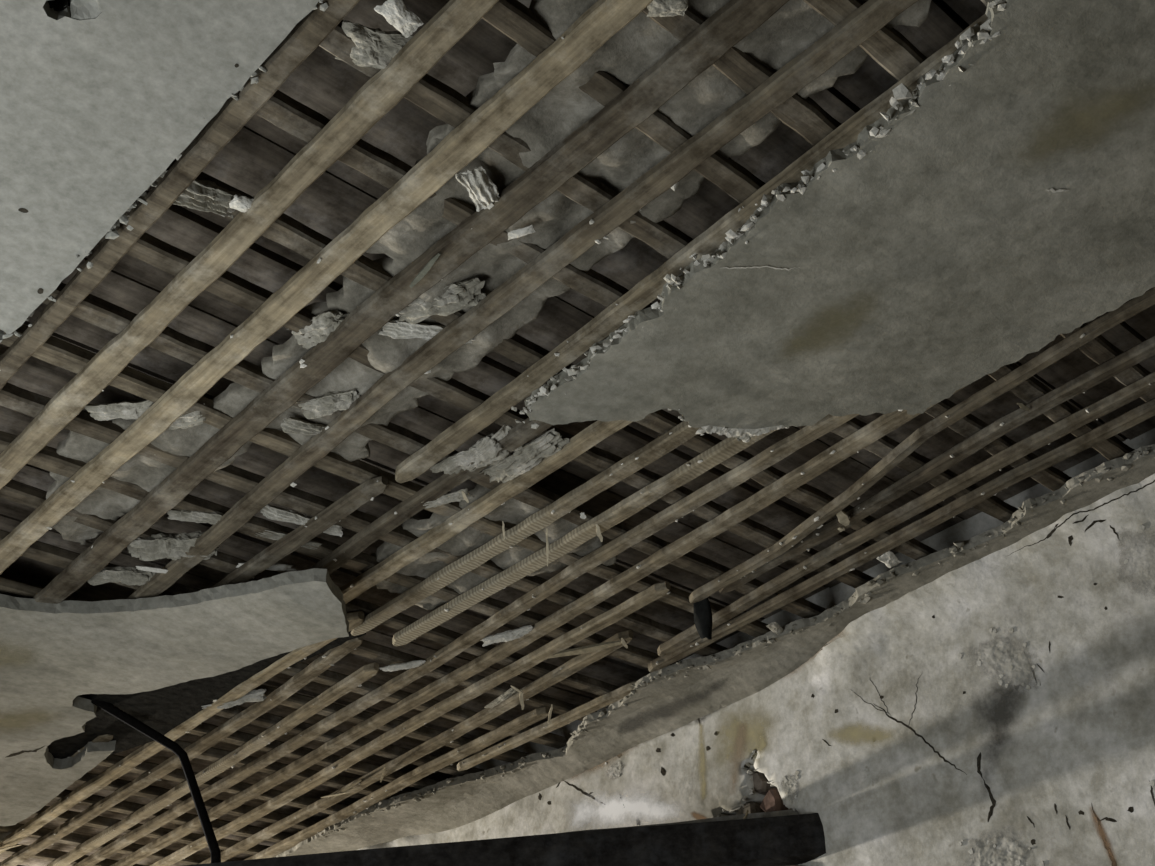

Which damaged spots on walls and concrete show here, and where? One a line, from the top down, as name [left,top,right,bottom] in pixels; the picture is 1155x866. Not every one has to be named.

spalling [47,0,102,20]
spalling [843,0,1007,160]
spalling [105,182,158,239]
spalling [651,163,836,312]
spalling [511,315,643,429]
spalling [668,409,789,443]
spalling [938,447,1155,564]
crack [1008,480,1155,556]
spalling [958,628,1041,692]
spalling [473,655,719,782]
crack [850,671,996,822]
spalling [958,830,1044,866]